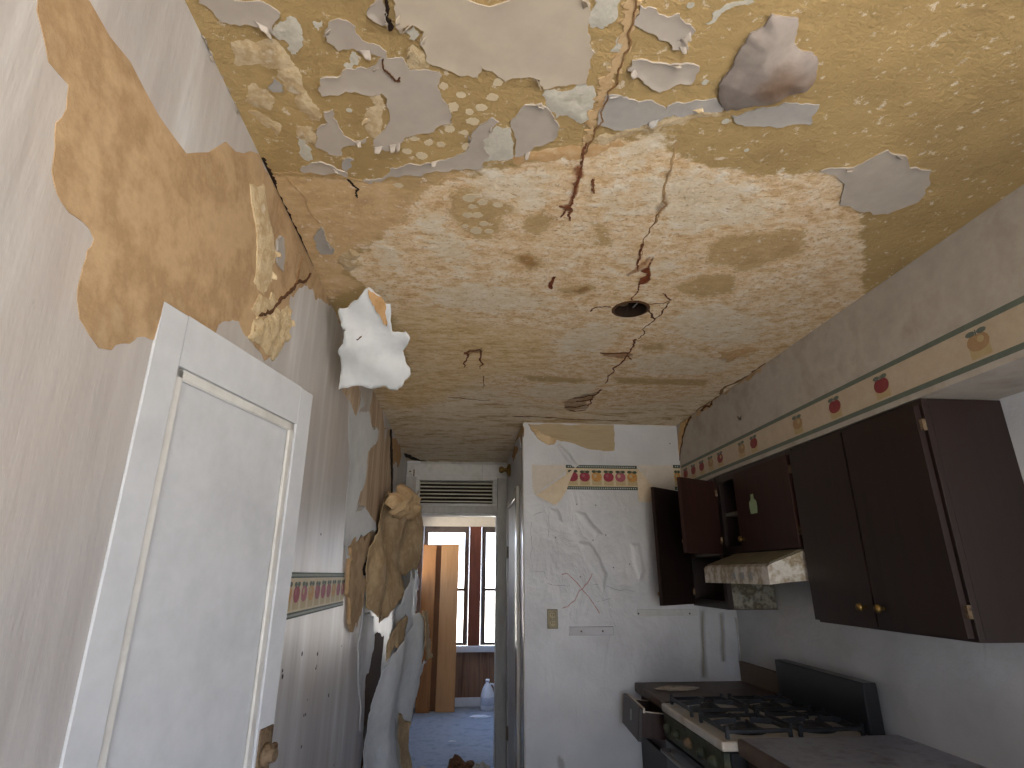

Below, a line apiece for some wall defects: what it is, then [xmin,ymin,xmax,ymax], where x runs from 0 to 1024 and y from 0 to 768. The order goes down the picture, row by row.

peeling [199,0,819,184]
crack [581,0,643,155]
flaking render [36,0,362,361]
crack [259,157,363,316]
crack [590,284,672,339]
crack [641,141,678,255]
peeling [820,149,931,215]
flaking render [342,386,401,563]